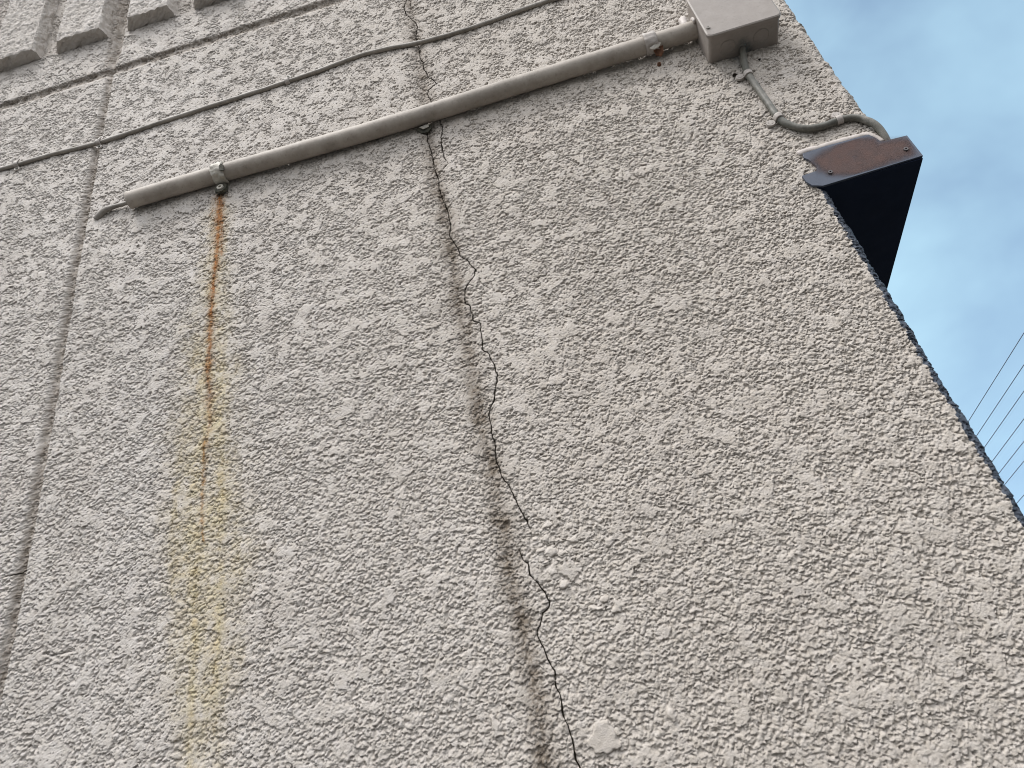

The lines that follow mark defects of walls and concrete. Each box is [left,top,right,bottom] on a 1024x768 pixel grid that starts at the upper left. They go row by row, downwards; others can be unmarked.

crack [404,0,437,101]
corrosion [209,194,223,317]
crack [427,124,581,768]